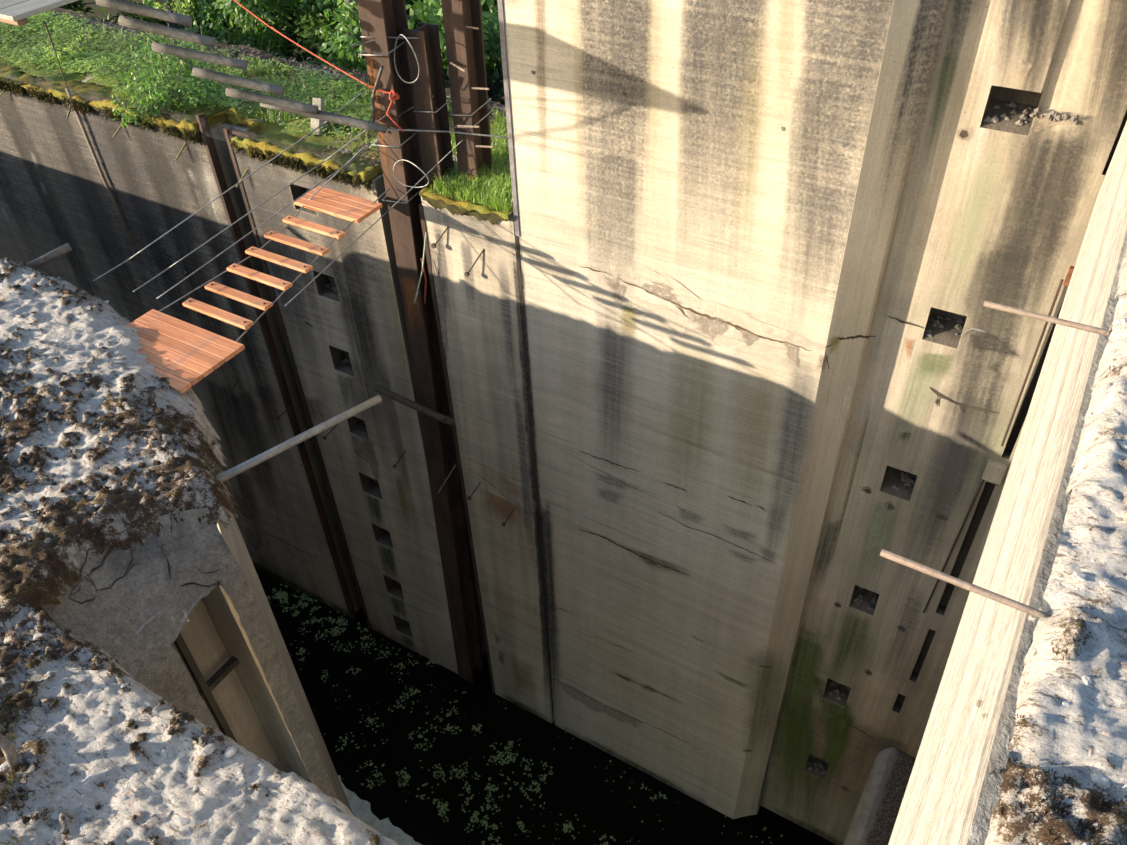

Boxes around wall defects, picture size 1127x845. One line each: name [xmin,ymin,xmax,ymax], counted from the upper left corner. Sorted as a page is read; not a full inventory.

damp [581,0,650,180]
damp [685,0,761,133]
damp [899,0,949,122]
damp [1005,0,1067,73]
damp [461,246,473,298]
damp [499,272,513,362]
crack [580,266,923,369]
crack [68,543,220,604]
damp [516,406,557,676]
crack [466,243,777,761]